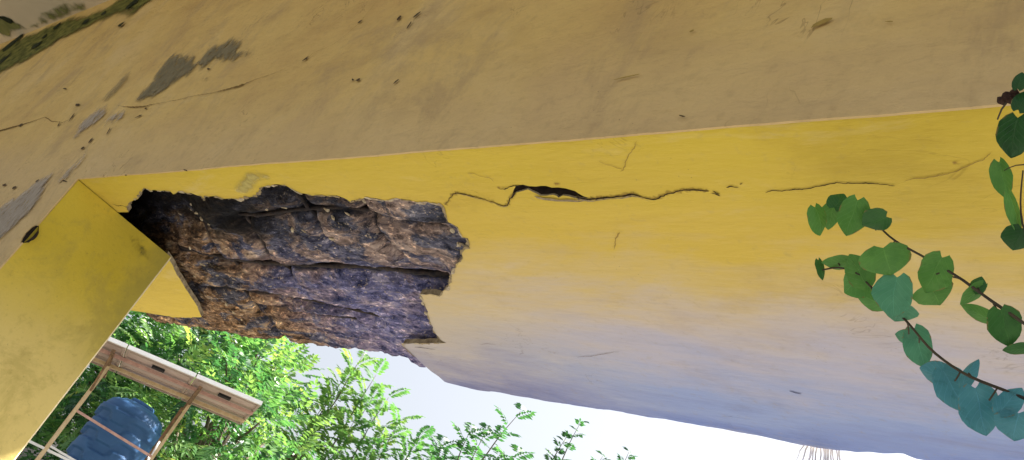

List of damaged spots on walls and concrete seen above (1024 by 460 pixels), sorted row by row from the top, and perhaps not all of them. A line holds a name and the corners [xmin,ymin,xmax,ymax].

crack [444,141,742,207]
crack [766,154,990,193]
spalling [117,174,470,367]